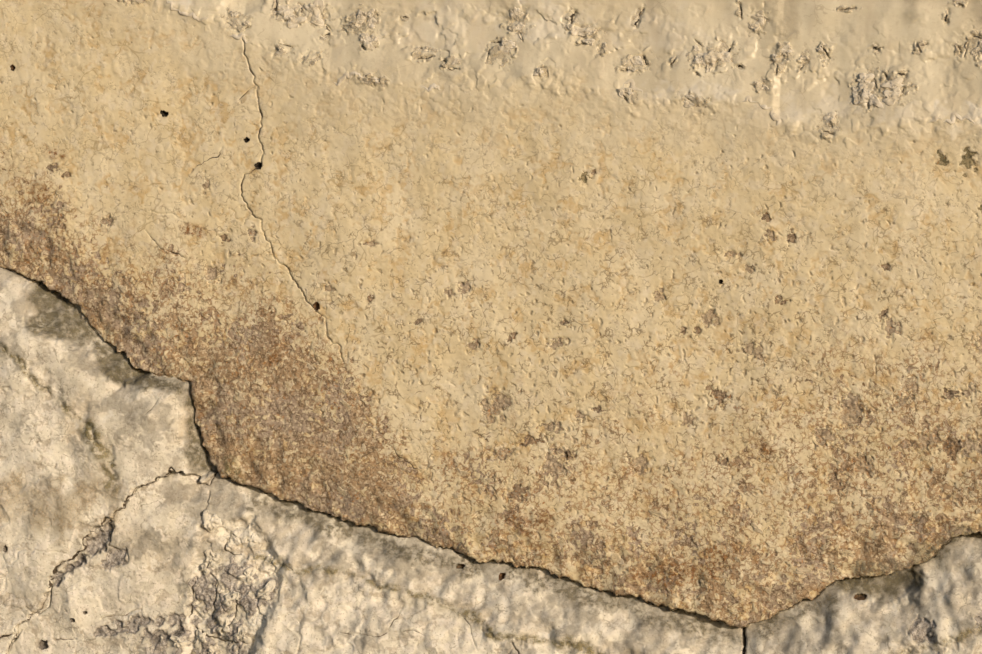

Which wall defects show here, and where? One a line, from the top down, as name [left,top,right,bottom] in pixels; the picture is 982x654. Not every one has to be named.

crack [239,47,343,360]
spalling [0,147,982,628]
crack [0,467,268,654]
spalling [94,549,279,654]
crack [296,501,564,579]
crack [588,587,748,654]
spalling [907,616,936,644]